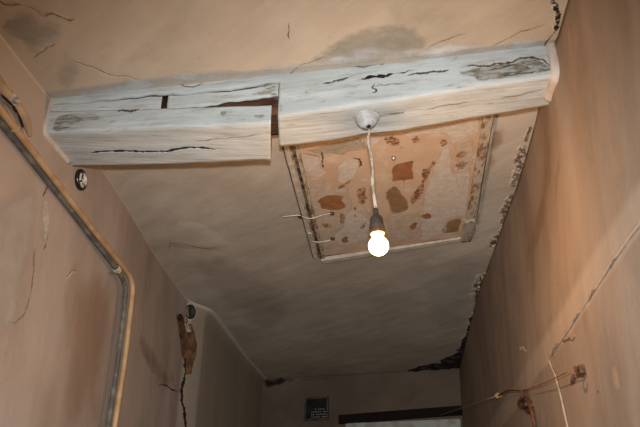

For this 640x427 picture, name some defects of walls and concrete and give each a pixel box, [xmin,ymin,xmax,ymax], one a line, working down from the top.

crack [0,0,74,22]
water stain [330,29,423,59]
flaking render [544,0,561,46]
peeling [302,135,394,249]
peeling [388,119,479,241]
flaking render [484,126,533,249]
crack [12,236,48,323]
crack [549,220,640,358]
flaking render [407,309,474,372]
crack [141,349,187,427]